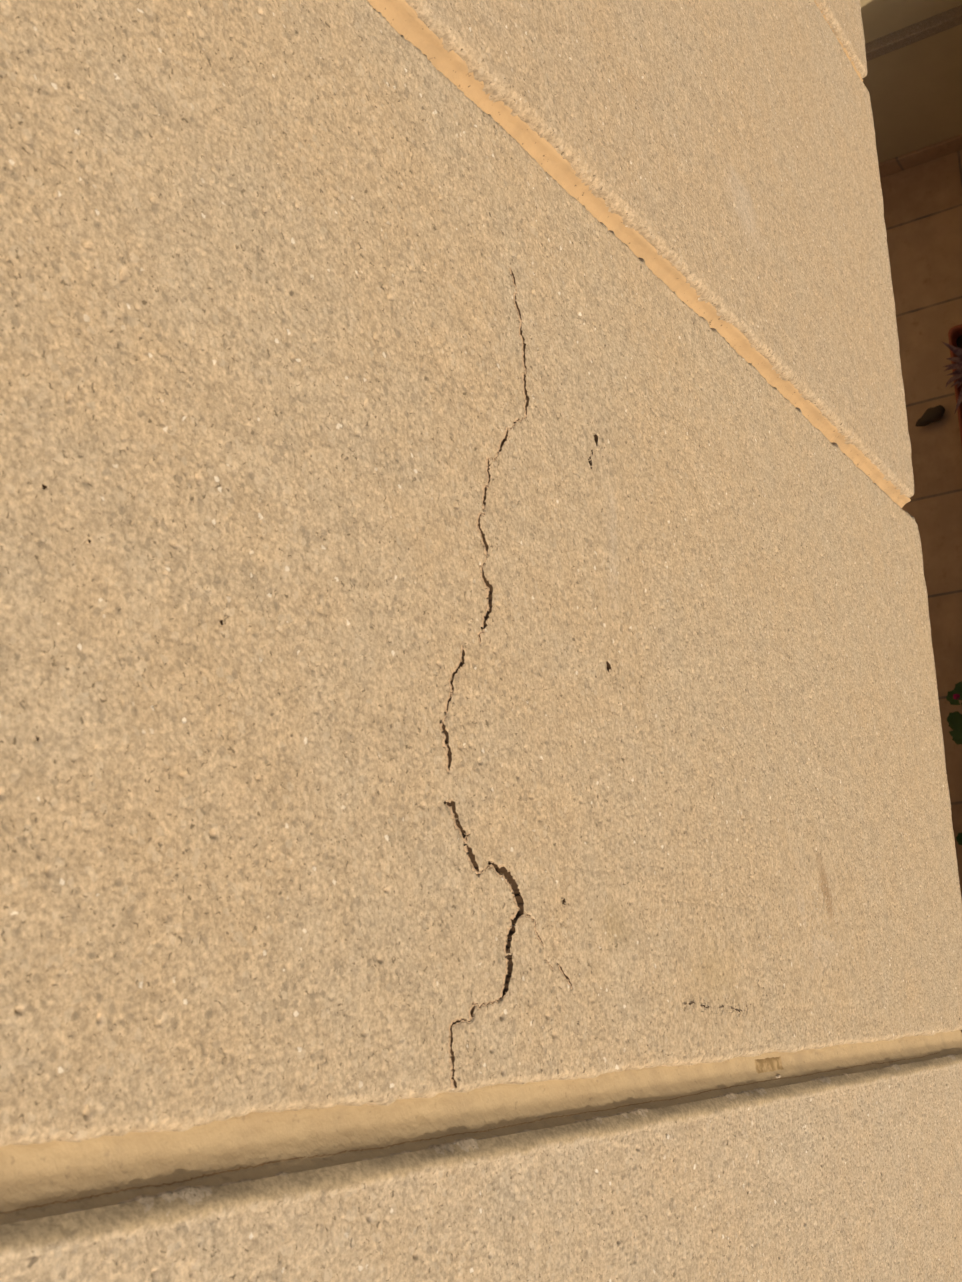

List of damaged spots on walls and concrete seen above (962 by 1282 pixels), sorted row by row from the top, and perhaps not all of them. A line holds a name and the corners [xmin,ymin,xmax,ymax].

crack [439,268,572,1089]
crack [684,1001,745,1012]
crack [0,1053,937,1214]